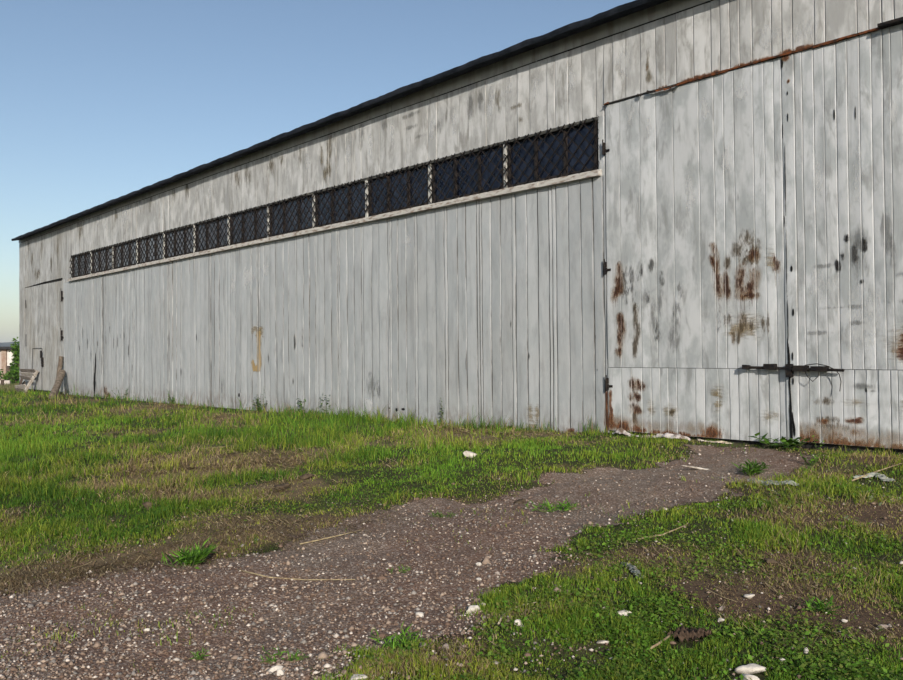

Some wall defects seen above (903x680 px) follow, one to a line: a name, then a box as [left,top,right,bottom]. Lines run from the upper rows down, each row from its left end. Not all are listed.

rust [614,263,634,302]
rust [710,230,770,344]
rust [617,313,625,356]
rust [604,379,722,438]